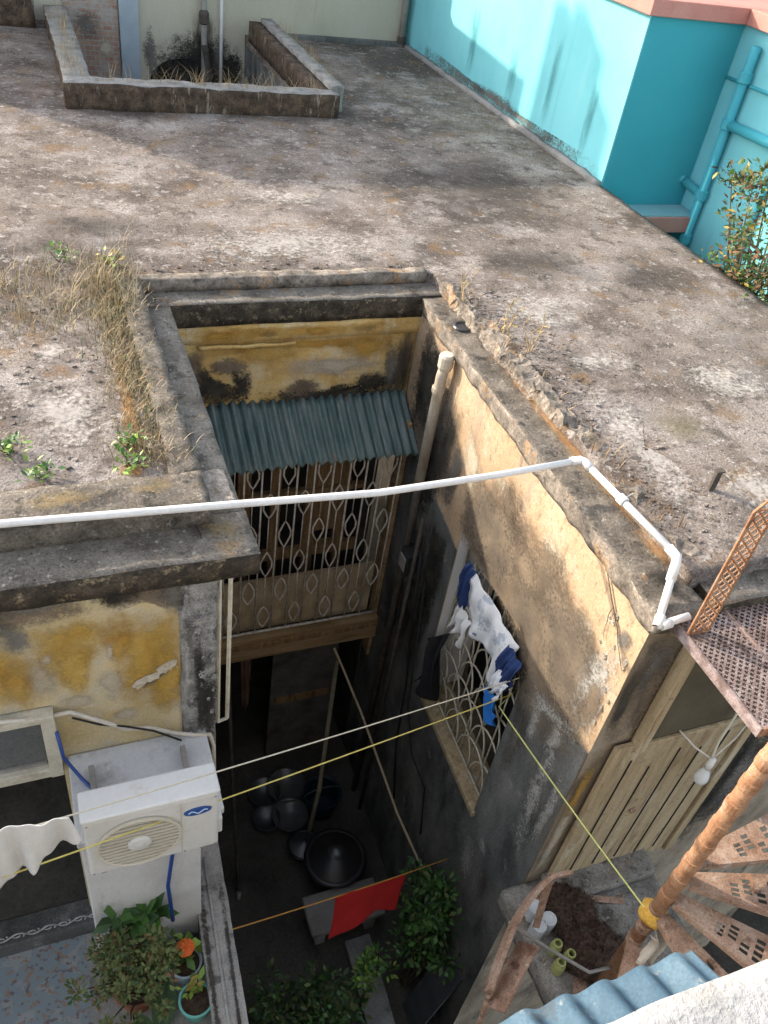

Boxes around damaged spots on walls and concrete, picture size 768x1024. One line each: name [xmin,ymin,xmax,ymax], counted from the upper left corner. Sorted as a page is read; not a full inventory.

water stain [143,32,243,84]
water stain [426,51,575,156]
water stain [188,331,463,512]
water stain [0,585,217,732]
spalling [132,594,218,714]